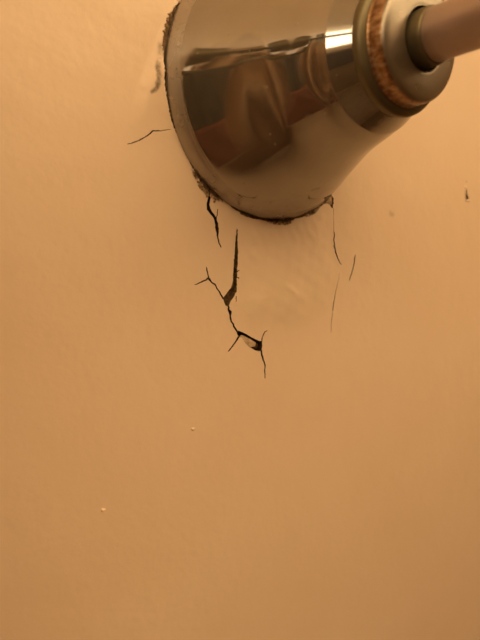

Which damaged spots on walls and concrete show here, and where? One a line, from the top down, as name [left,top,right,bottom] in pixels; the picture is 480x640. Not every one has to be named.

crack [128,129,171,144]
crack [195,189,268,374]
crack [331,208,356,328]